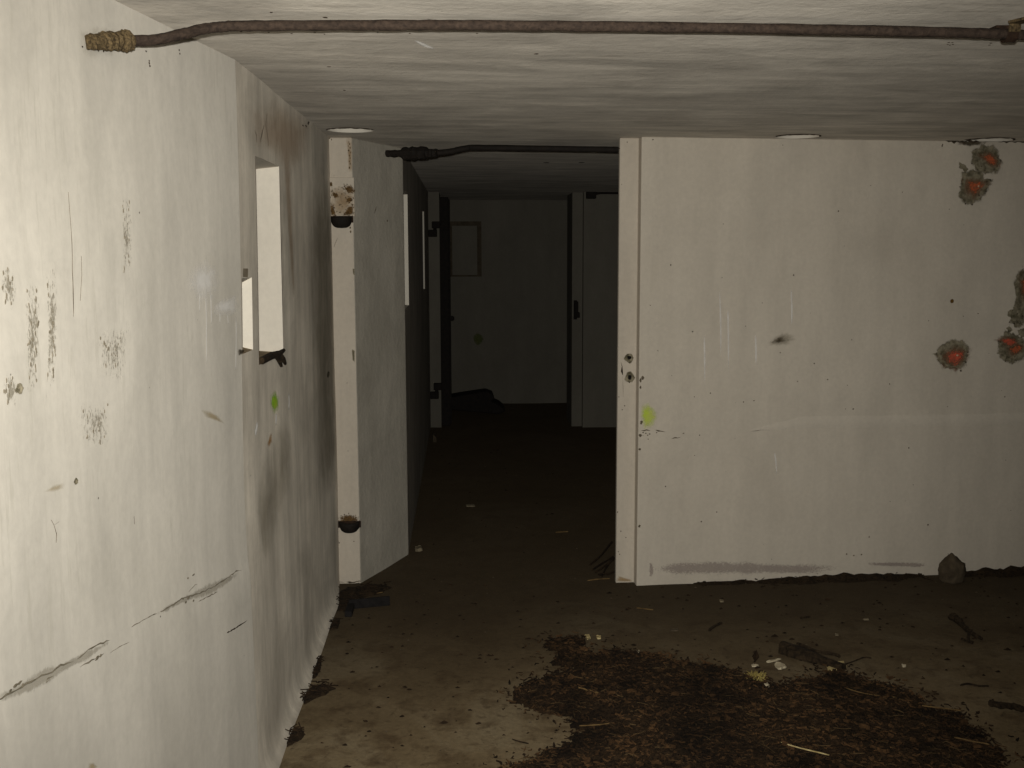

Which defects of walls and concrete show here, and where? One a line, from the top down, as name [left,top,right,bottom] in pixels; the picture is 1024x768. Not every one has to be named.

spalling [959,137,1016,205]
spalling [934,340,969,372]
spalling [997,269,1024,364]
crack [0,570,241,700]